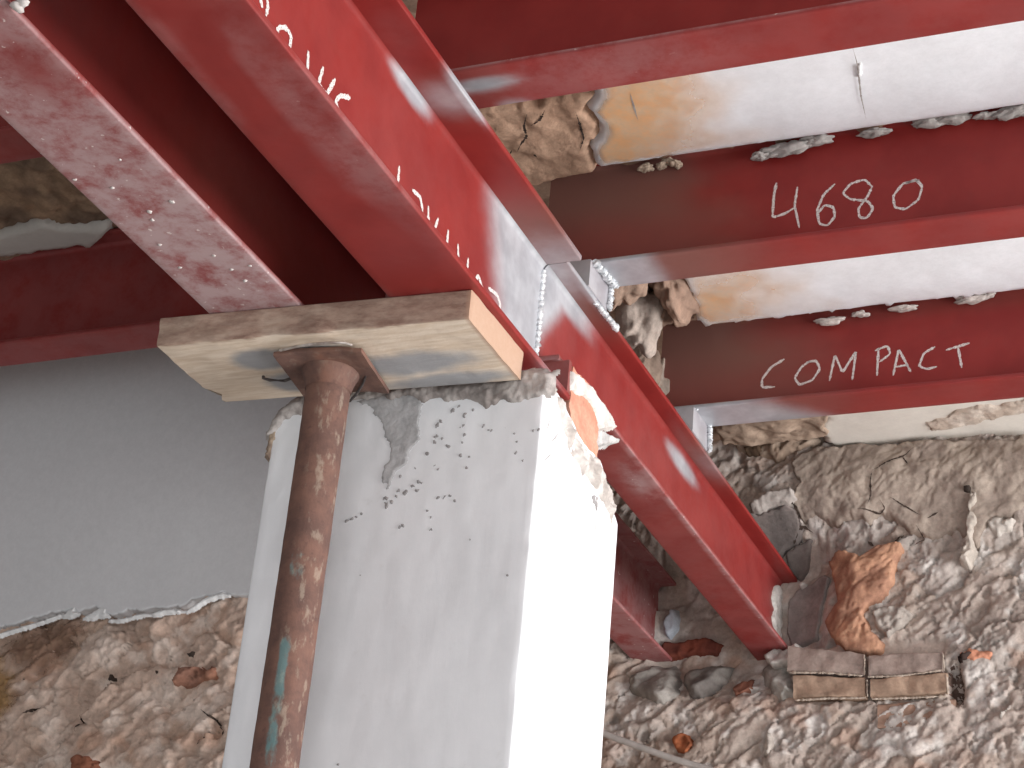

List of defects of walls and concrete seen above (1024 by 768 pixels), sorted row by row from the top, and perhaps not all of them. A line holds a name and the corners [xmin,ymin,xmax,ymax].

crack [853,50,866,117]
crack [510,110,545,157]
spalling [479,90,600,185]
crack [576,115,584,149]
corrosion [599,76,693,163]
spalling [265,396,304,462]
spalling [350,368,620,524]
crack [858,449,938,546]
flaking render [0,592,231,639]
flaking render [787,541,959,729]
flaking render [172,666,219,689]
flaking render [70,754,101,768]